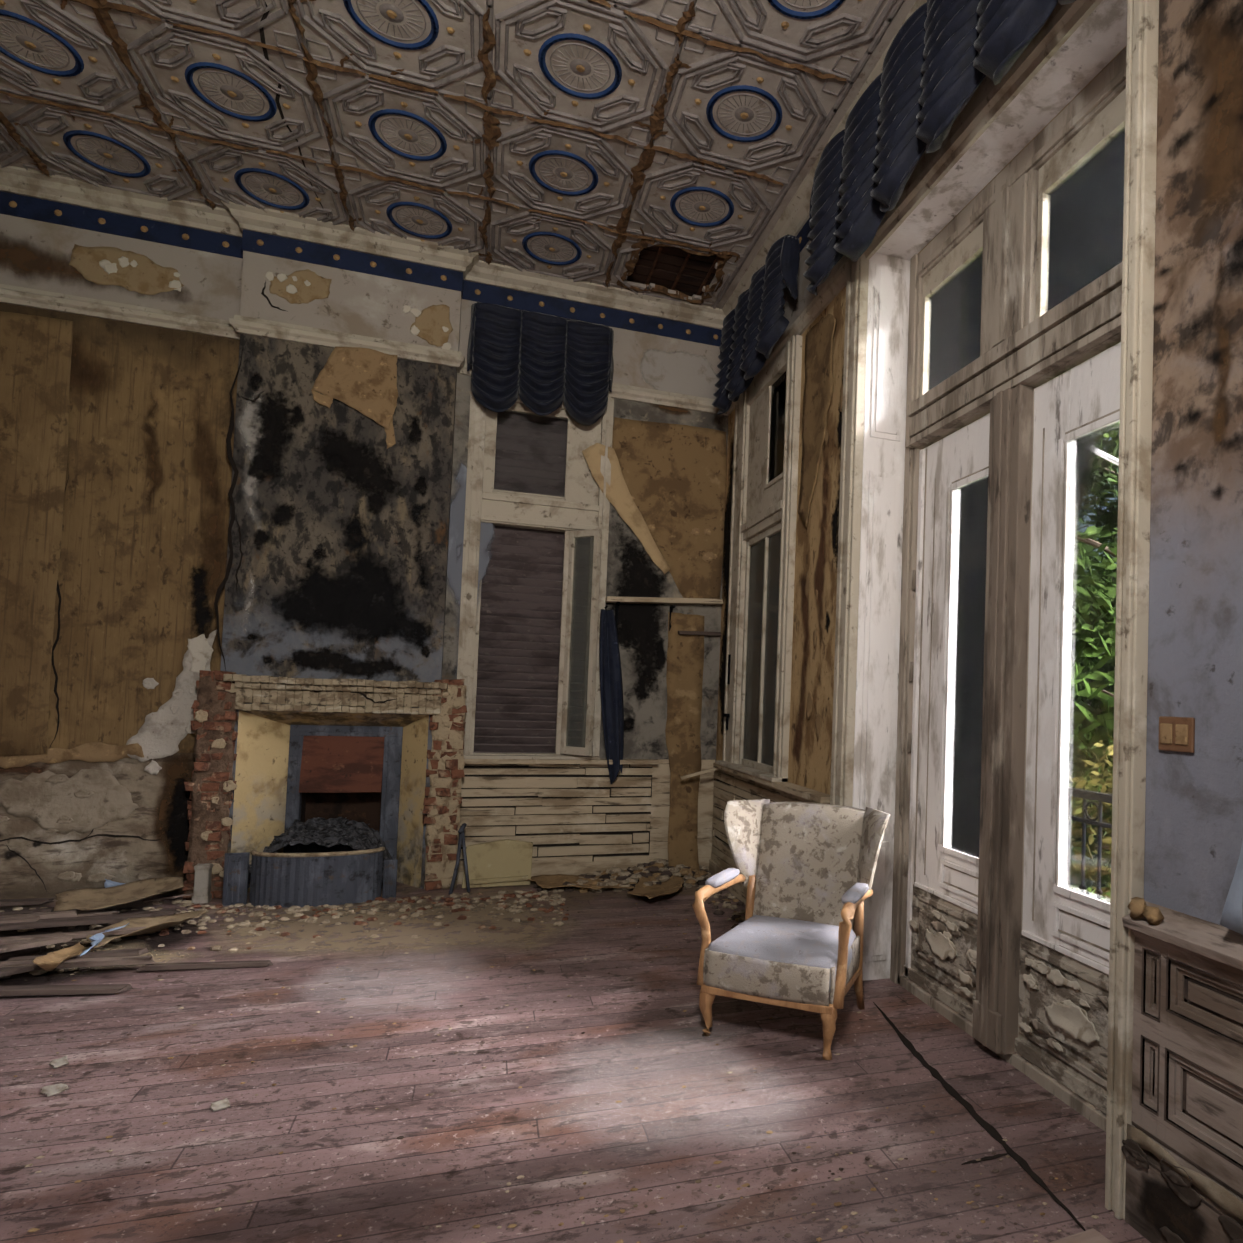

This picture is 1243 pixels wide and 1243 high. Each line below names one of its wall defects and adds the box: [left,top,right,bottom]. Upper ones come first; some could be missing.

crack [0,0,846,289]
leakage [0,238,103,286]
peeling [69,244,184,295]
crack [261,282,288,312]
peeling [265,269,332,304]
peeling [403,304,453,350]
leakage [241,372,304,514]
leakage [314,427,428,587]
mould [609,536,667,701]
mould [292,648,404,680]
flaking render [126,630,241,900]
peeling [0,769,139,835]